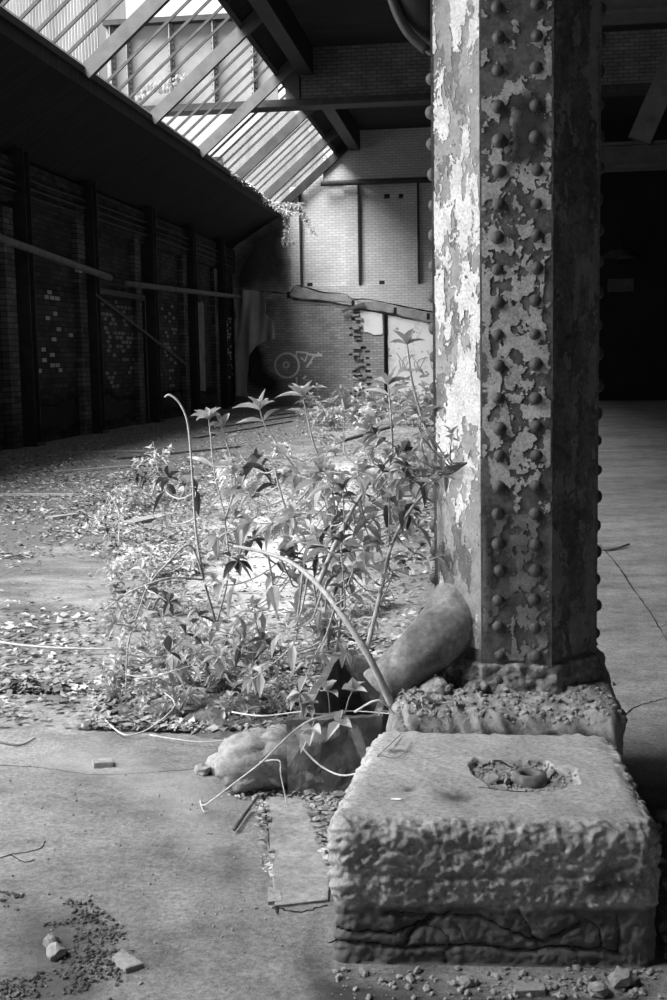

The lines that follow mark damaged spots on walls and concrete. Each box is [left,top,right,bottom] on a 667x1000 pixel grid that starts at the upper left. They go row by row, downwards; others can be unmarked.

spalling [349,308,372,398]
peeling [388,0,600,661]
crack [600,545,667,640]
crack [262,796,270,848]
crack [274,904,620,963]